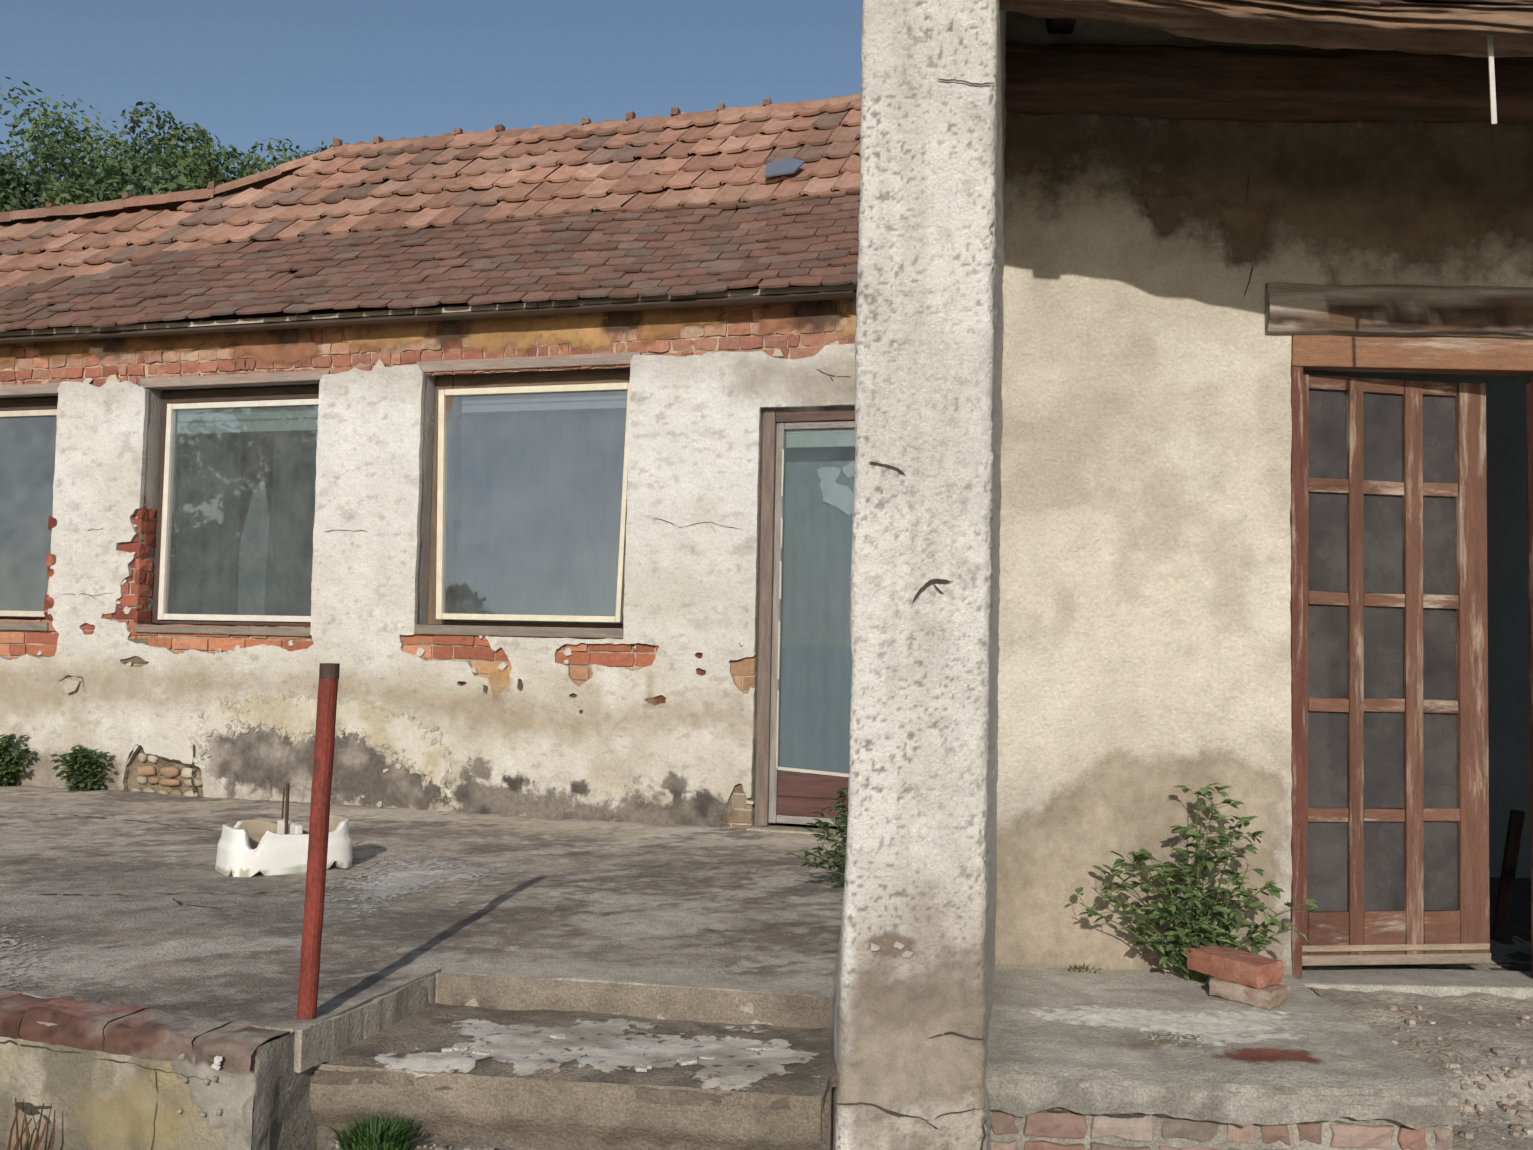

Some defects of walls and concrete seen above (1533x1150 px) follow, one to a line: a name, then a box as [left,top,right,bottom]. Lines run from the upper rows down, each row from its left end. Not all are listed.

leakage [1004,111,1533,272]
flaking render [0,299,856,387]
flaking render [0,552,59,660]
flaking render [81,496,314,667]
flaking render [402,634,523,694]
flaking render [548,637,659,714]
flaking render [730,645,756,696]
leakage [208,719,315,800]
leakage [331,730,733,828]
crack [0,1040,224,1150]
flaking render [374,1018,820,1092]
crack [928,1031,983,1040]